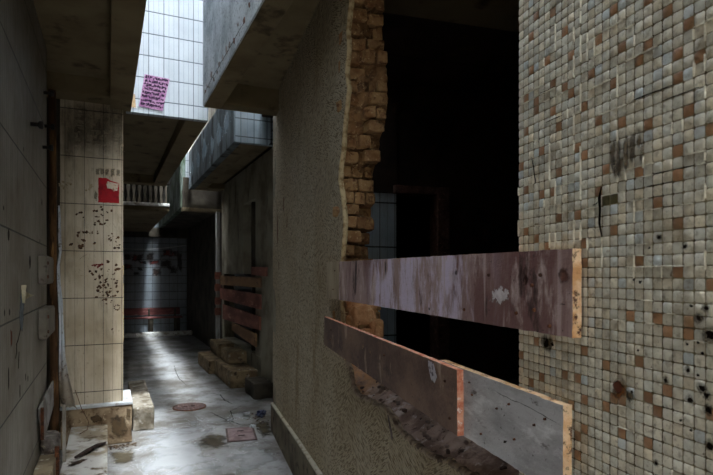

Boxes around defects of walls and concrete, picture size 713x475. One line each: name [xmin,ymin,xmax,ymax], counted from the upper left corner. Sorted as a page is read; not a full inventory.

spalling [332,0,388,261]
crack [594,187,602,237]
spalling [541,336,554,351]
spalling [686,304,713,355]
spalling [685,366,713,417]